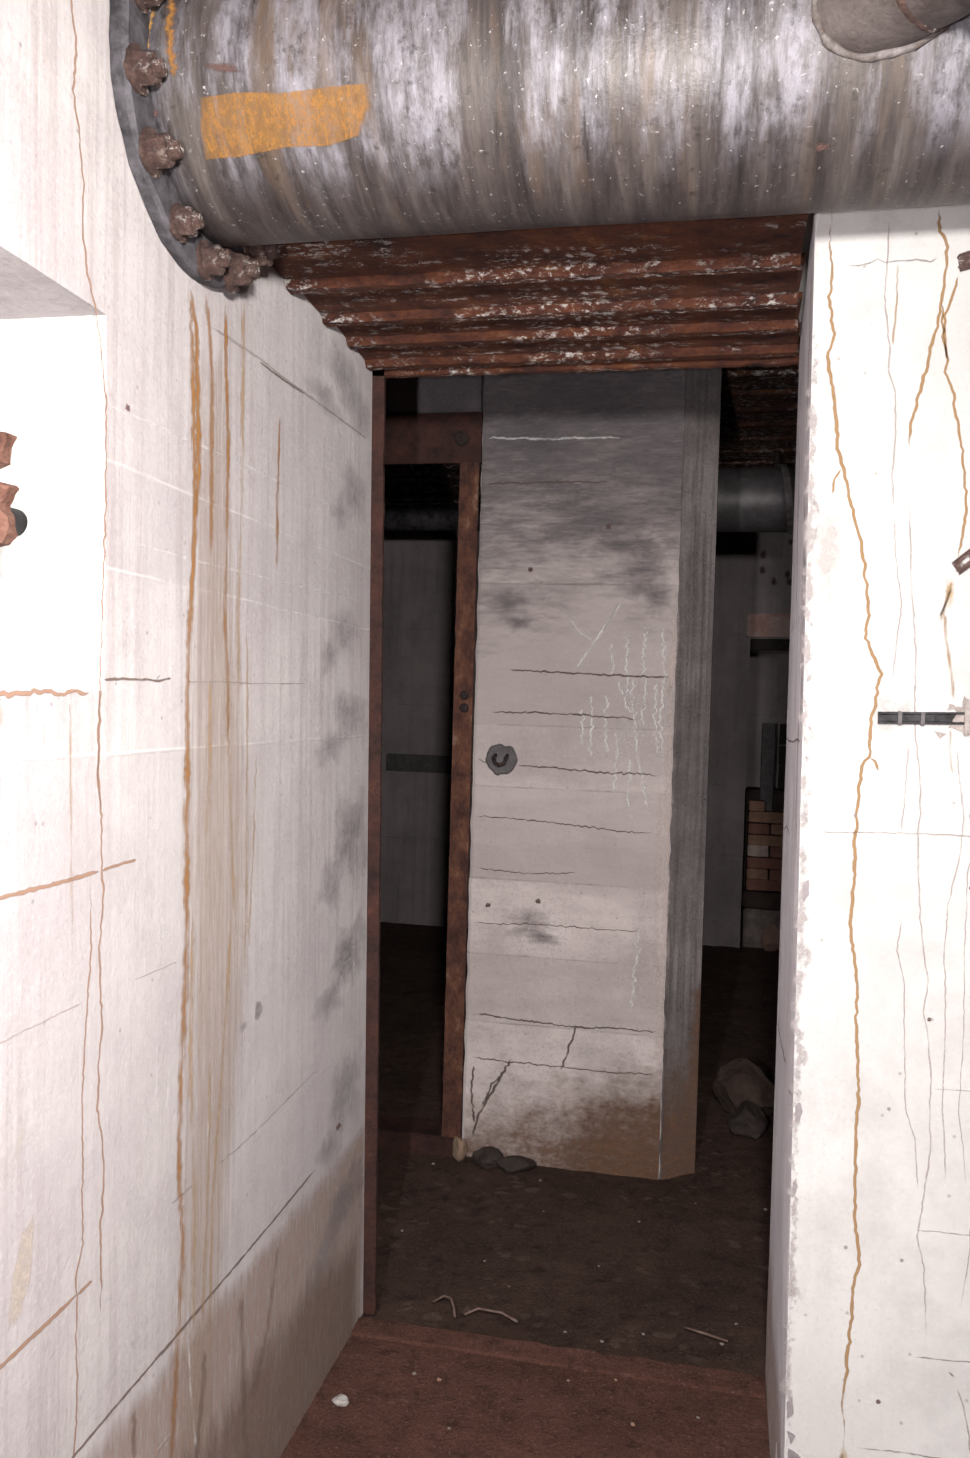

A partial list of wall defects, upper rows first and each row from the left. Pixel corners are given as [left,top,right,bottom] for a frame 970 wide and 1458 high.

corrosion [149,1,177,74]
crack [0,0,310,1458]
corrosion [177,300,251,1311]
crack [826,216,970,1425]
crack [470,1013,653,1133]
damp [466,991,700,1180]
peeling [787,1397,805,1458]